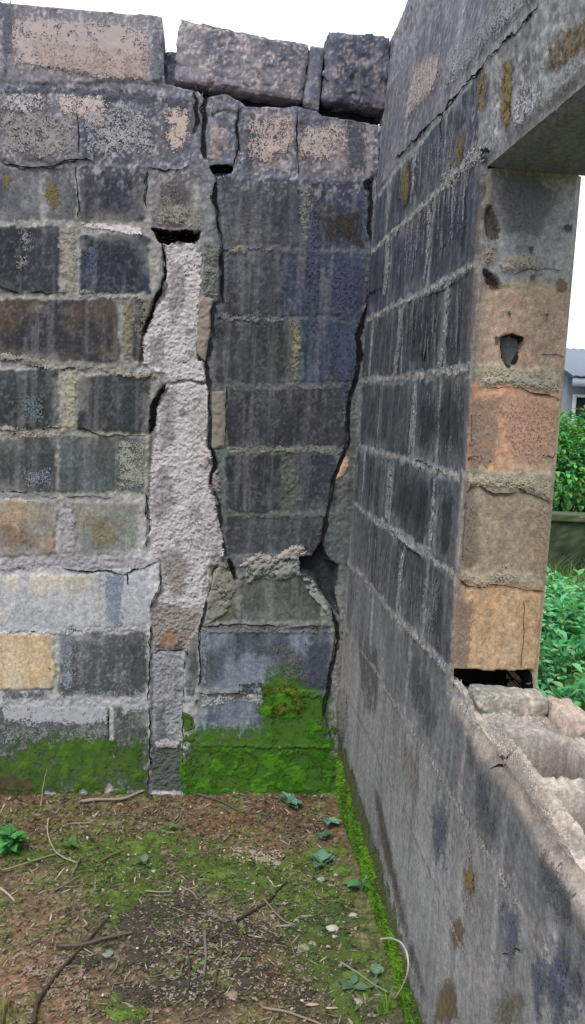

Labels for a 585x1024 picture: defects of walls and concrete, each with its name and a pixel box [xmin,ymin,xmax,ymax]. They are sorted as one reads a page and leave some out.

crack [366,3,539,238]
peeling [135,294,165,348]
crack [0,92,347,789]
spalling [151,196,229,459]
crack [321,288,382,545]
peeling [451,676,574,865]
leakage [373,783,431,1009]